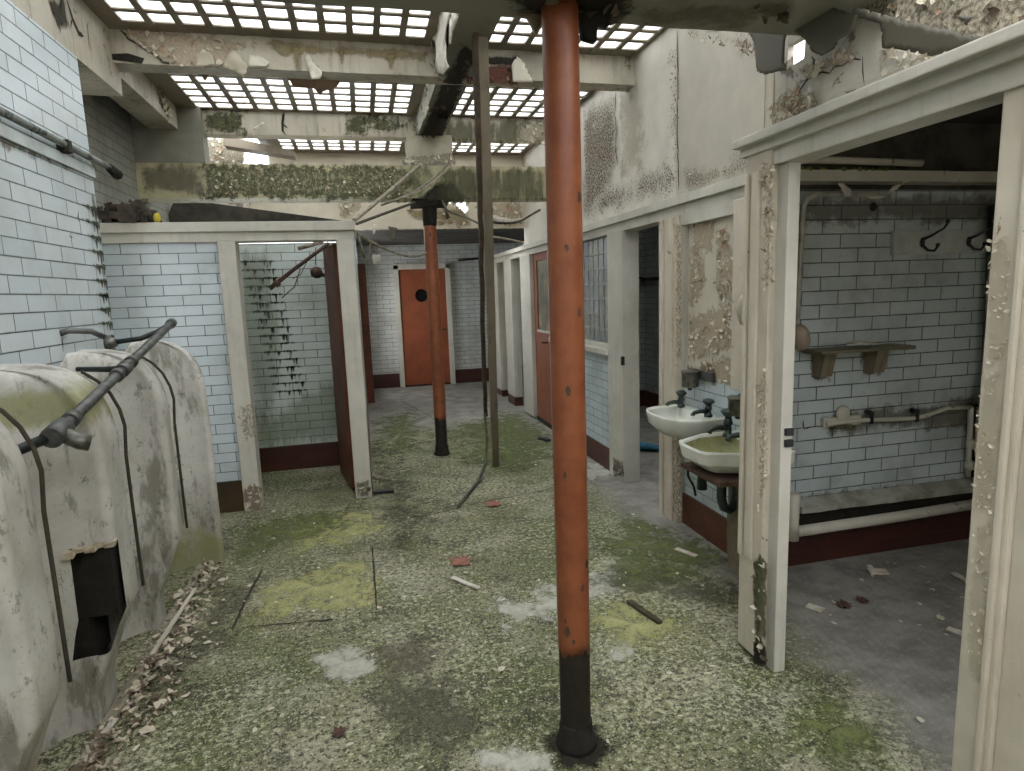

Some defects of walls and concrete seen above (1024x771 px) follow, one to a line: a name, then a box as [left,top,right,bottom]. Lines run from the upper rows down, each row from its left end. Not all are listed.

spalling [864,0,1024,37]
peeling [112,29,257,68]
crack [799,56,864,92]
peeling [879,48,935,76]
water stain [143,166,203,195]
peeling [688,220,733,386]
water stain [241,260,306,395]
peeling [244,483,262,510]